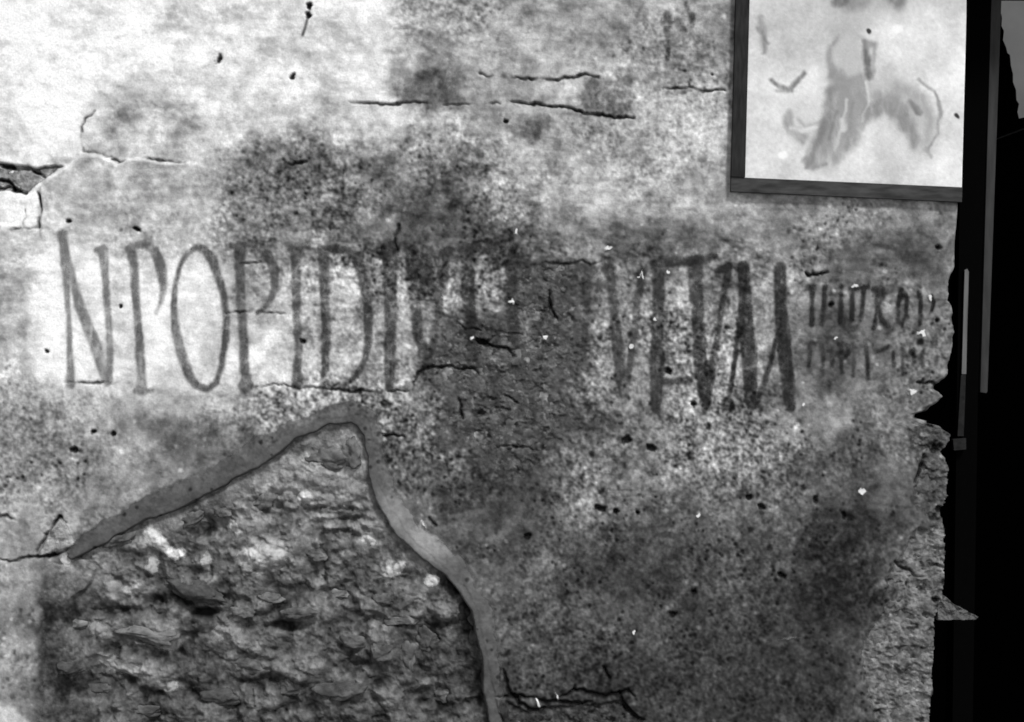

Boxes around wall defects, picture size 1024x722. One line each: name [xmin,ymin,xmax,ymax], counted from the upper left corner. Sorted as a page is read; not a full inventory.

crack [529,73,628,119]
crack [0,164,47,207]
spalling [36,423,489,722]
crack [504,667,641,719]